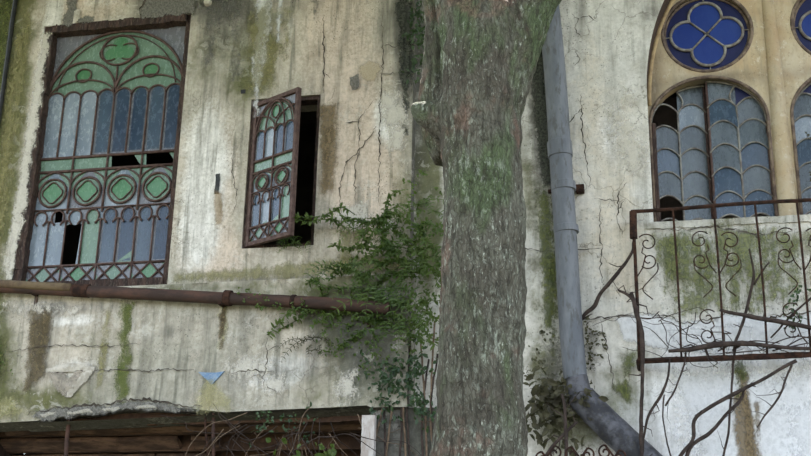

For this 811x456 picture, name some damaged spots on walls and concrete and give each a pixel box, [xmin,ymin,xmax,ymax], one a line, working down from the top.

spalling [141,0,195,19]
leakage [252,0,282,113]
crack [338,16,396,228]
crack [570,96,627,283]
leakage [23,308,52,391]
spalling [46,363,95,397]
spalling [33,401,199,421]